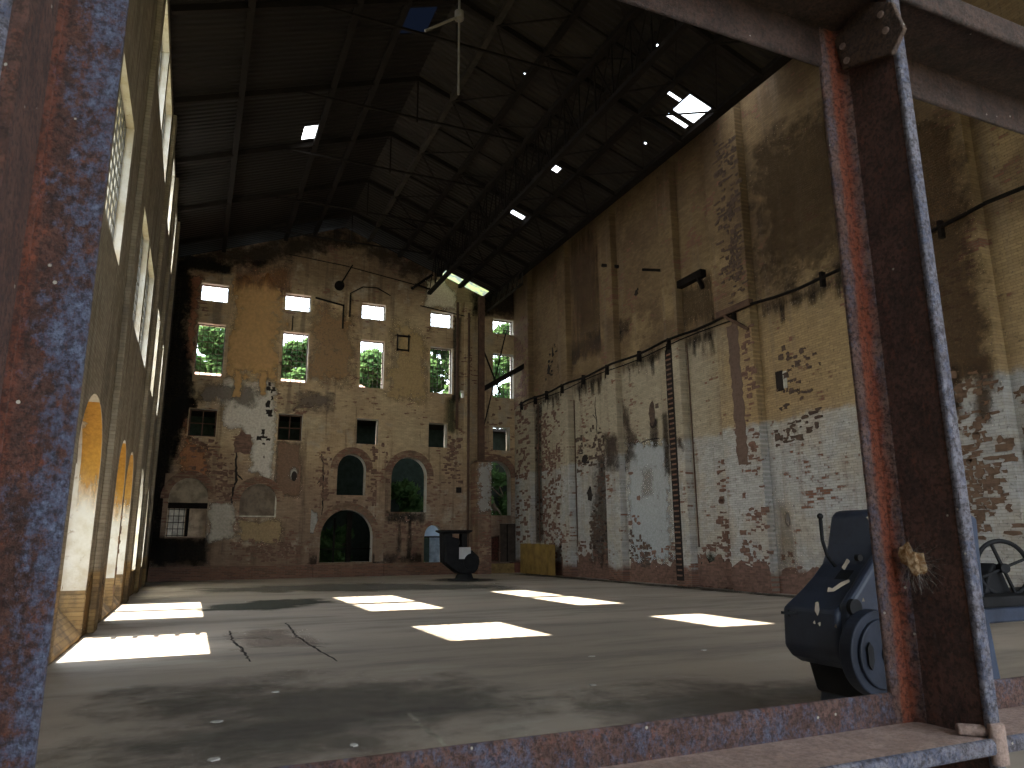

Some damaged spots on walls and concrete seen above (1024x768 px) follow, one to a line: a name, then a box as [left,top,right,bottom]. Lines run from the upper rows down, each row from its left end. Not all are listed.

water stain [749,103,842,322]
water stain [916,115,994,422]
crack [230,453,243,504]
spalling [265,382,276,417]
flaking render [575,425,609,579]
flaking render [628,515,677,585]
flaking render [726,323,765,488]
flaking render [697,459,819,594]
peeling [773,407,823,447]
flaking render [776,345,821,411]
peeling [951,370,1024,540]
crack [225,623,337,662]